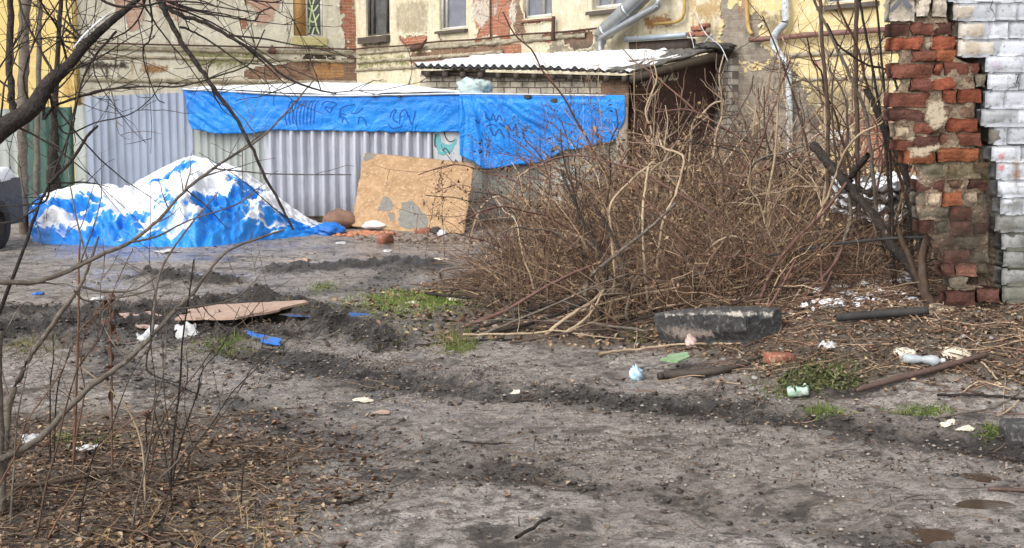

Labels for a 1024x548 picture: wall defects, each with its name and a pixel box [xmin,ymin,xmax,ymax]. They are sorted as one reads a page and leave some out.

peeling [238,0,357,83]
peeling [397,0,596,65]
peeling [954,7,983,56]
peeling [848,86,898,171]